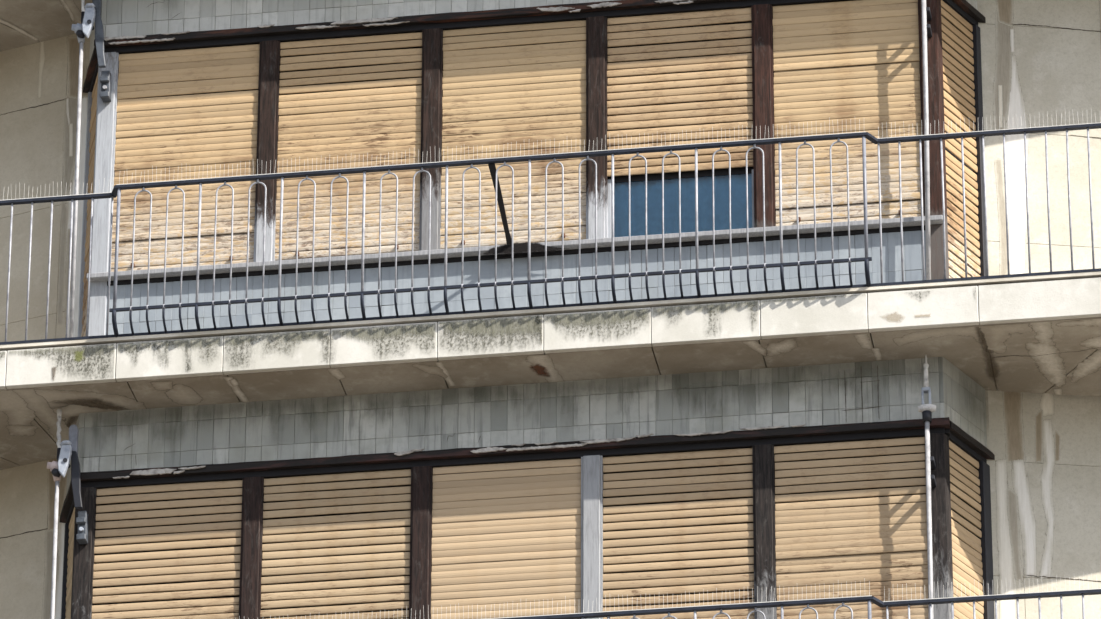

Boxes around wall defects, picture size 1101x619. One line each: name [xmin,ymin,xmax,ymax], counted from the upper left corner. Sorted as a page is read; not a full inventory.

damp [0,36,765,442]
corrosion [531,365,550,377]
peeling [676,424,805,436]
peeling [470,433,654,453]
peeling [113,466,206,479]
damp [893,319,1101,619]
damp [42,458,67,619]